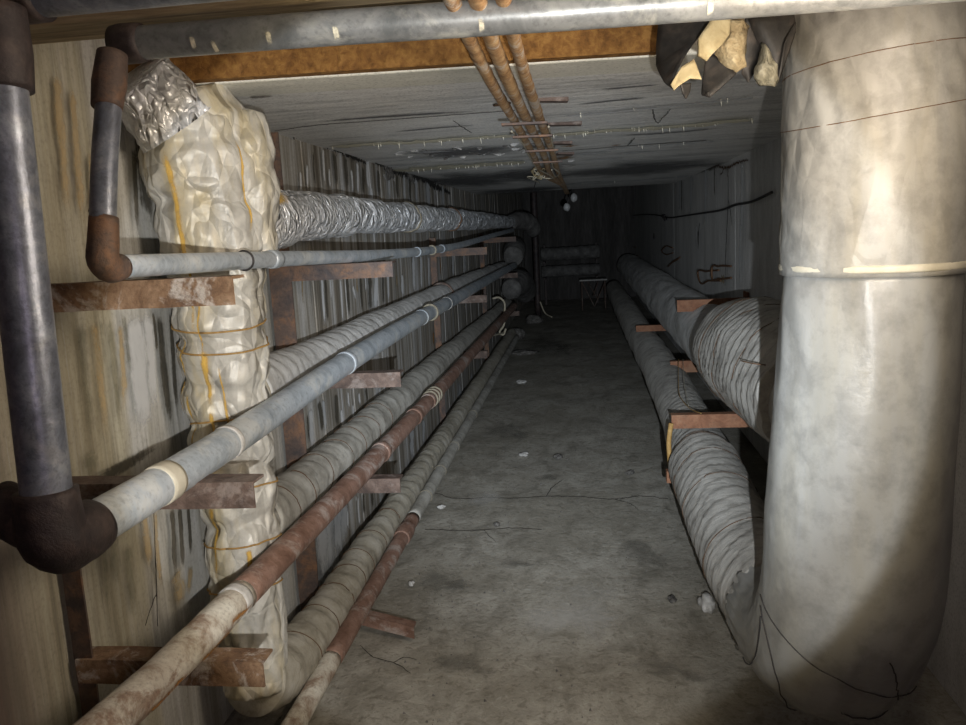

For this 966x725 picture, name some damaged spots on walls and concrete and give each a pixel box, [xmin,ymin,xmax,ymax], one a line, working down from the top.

damp [334,112,456,121]
damp [300,118,753,210]